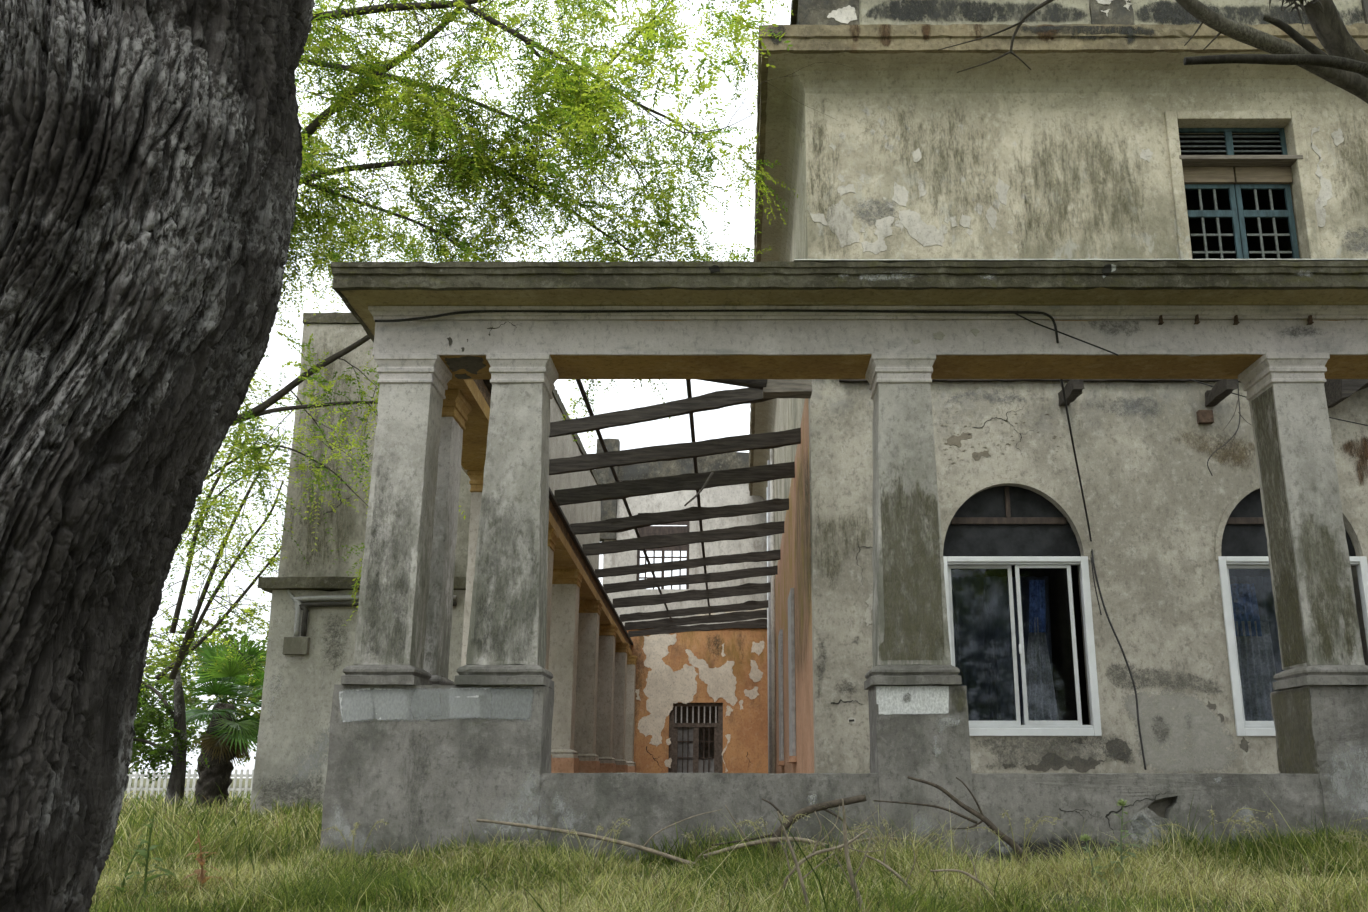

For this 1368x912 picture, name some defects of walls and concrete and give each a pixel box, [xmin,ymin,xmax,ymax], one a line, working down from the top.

water stain [769,25,787,45]
water stain [866,0,1310,44]
peeling [1096,0,1132,17]
water stain [1338,8,1364,25]
water stain [899,115,979,208]
water stain [1018,136,1144,240]
rust [1343,436,1368,484]
peeling [635,634,765,768]